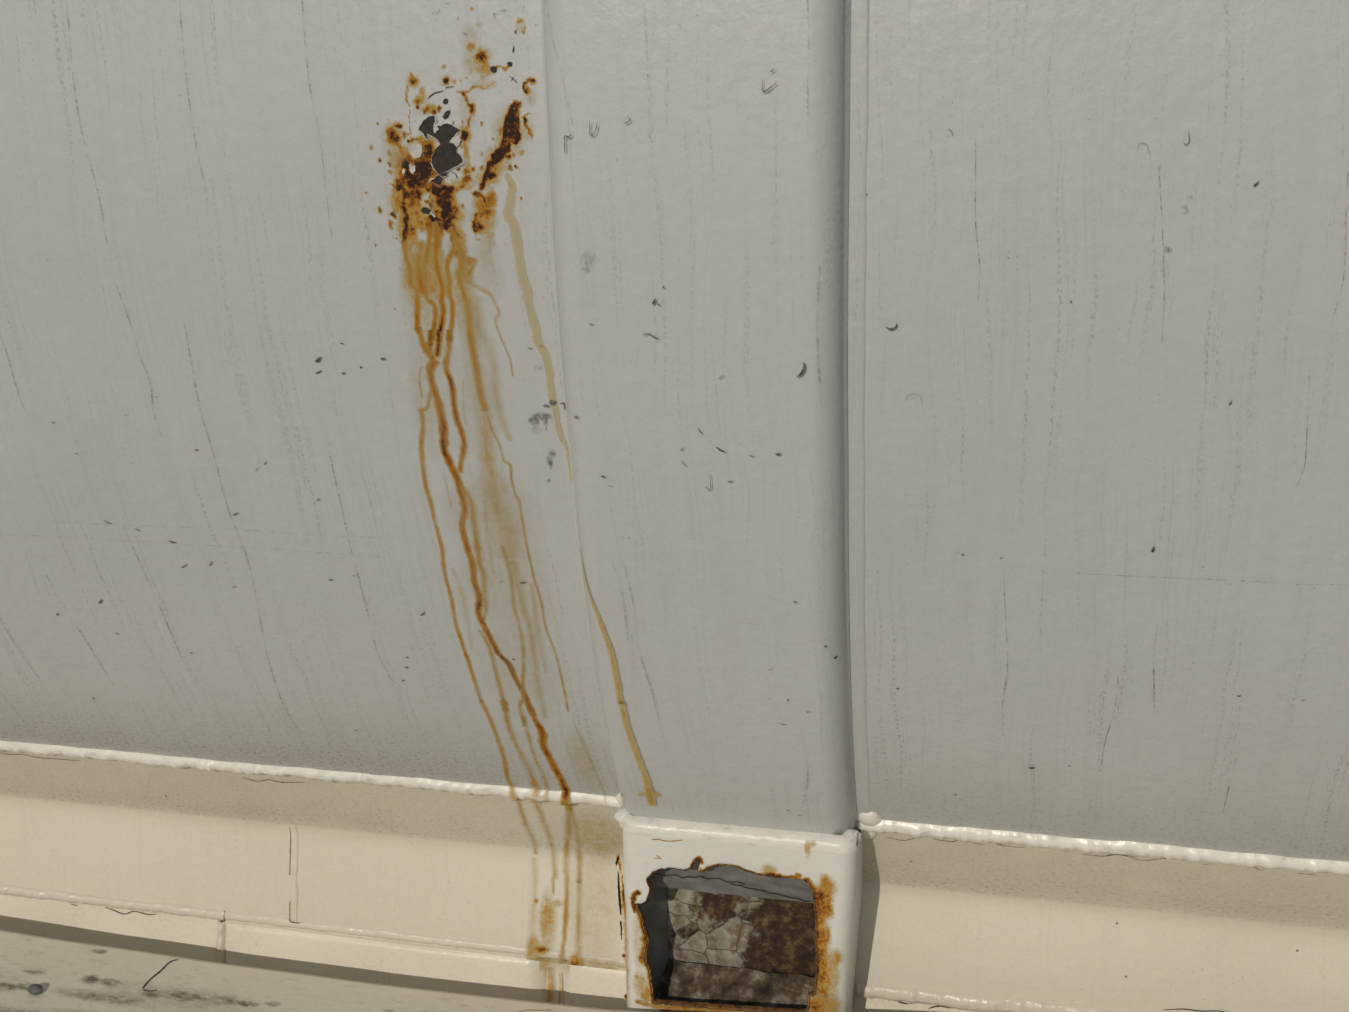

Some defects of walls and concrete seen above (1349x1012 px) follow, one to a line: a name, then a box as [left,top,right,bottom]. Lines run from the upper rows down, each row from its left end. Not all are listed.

peeling [402,98,467,188]
corrosion [369,42,613,1012]
corrosion [579,548,660,806]
corrosion [630,890,775,1012]
corrosion [689,856,841,1012]